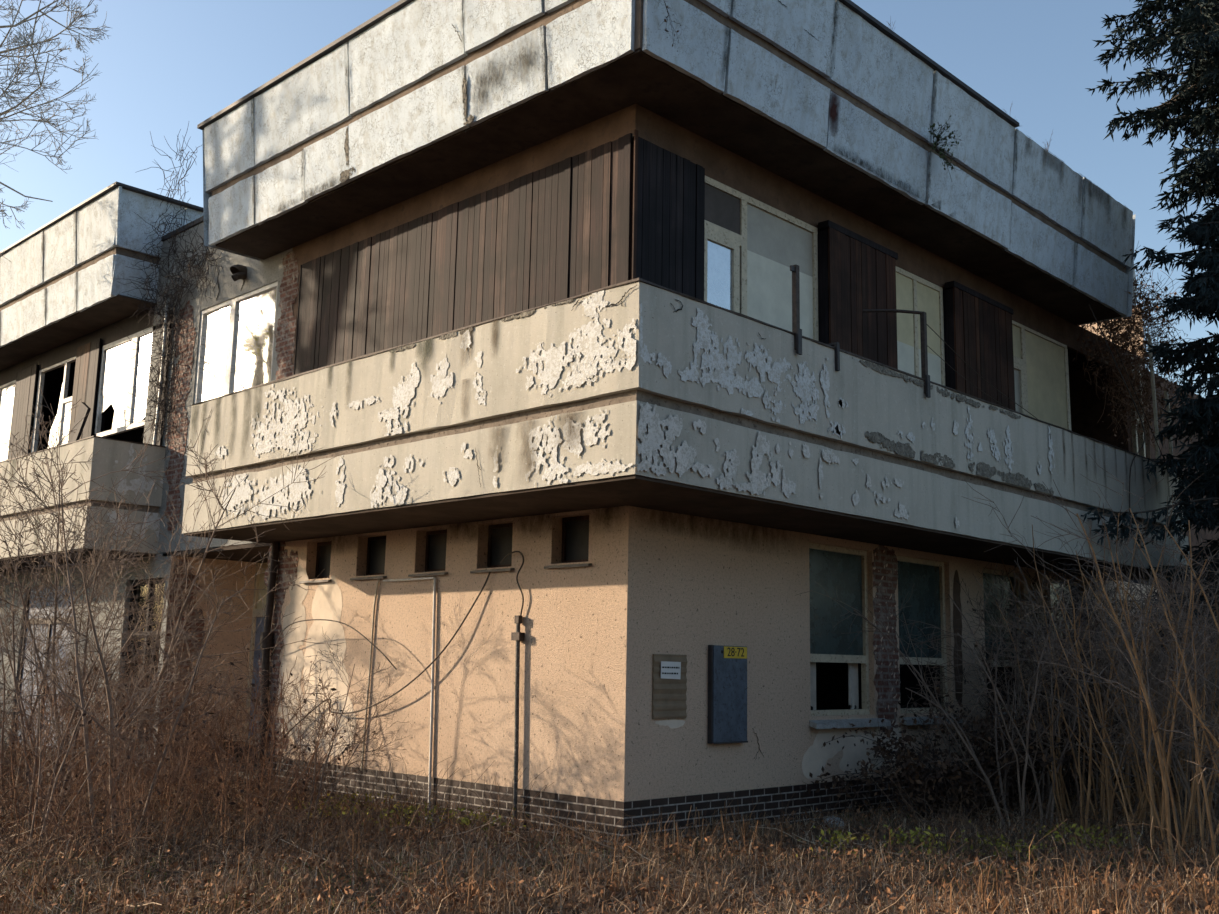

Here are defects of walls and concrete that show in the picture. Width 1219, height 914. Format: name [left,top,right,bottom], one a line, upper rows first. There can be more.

leakage [462,25,546,101]
peeling [222,251,486,521]
peeling [502,290,914,520]